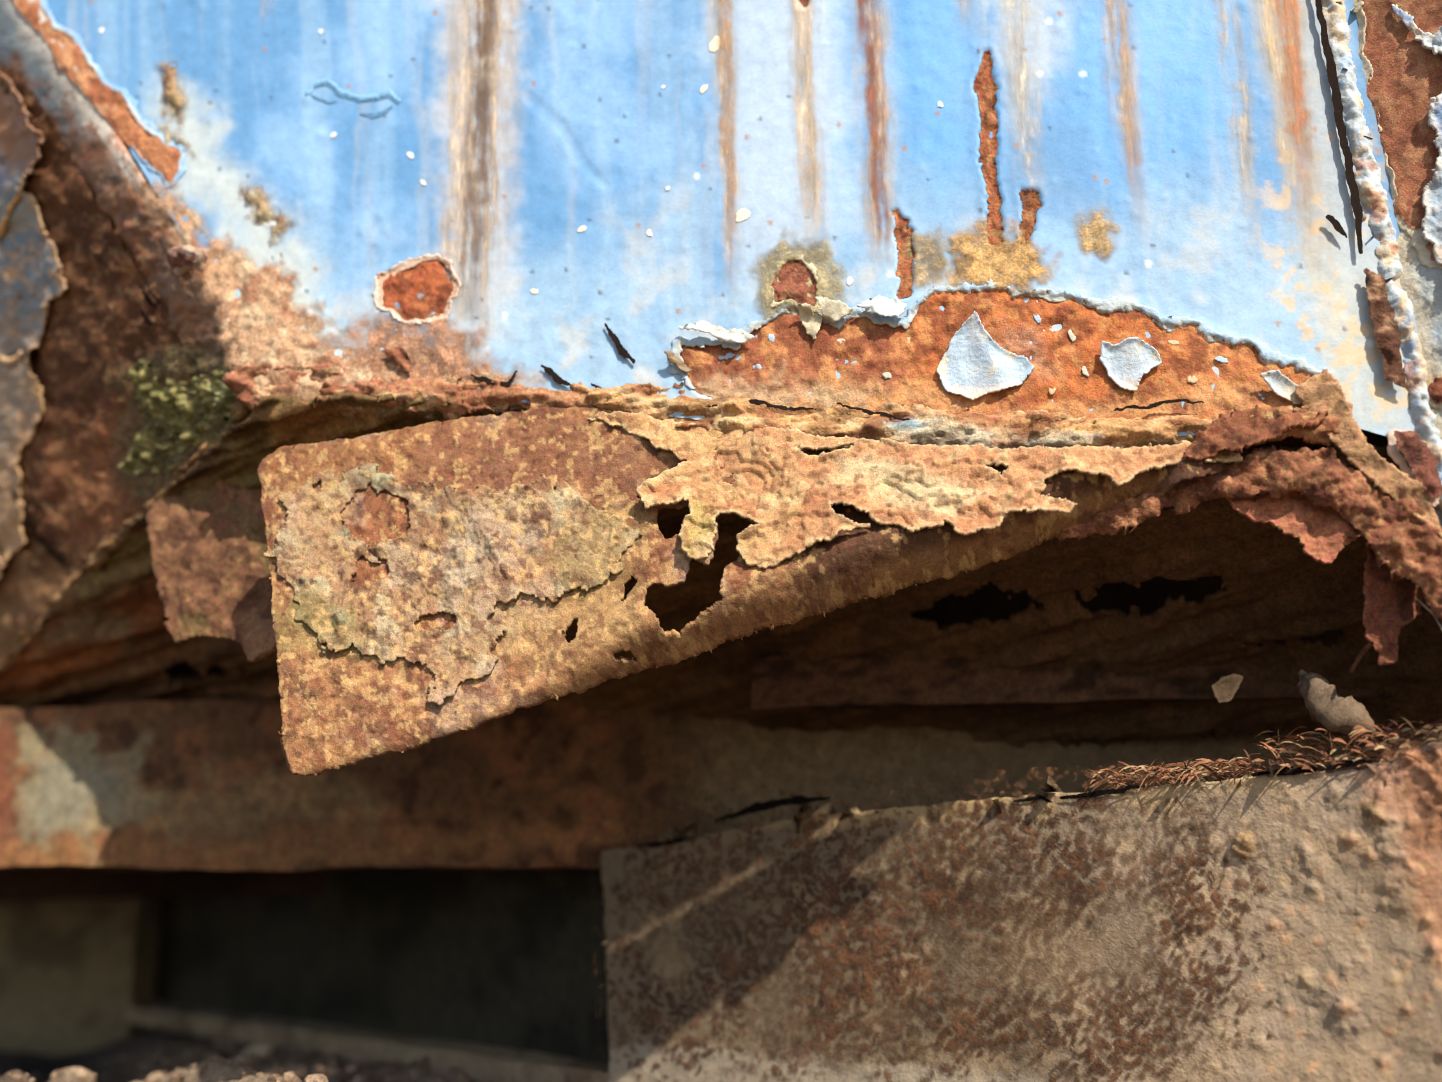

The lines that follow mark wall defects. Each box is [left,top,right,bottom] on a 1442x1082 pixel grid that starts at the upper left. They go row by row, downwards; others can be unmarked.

peeling [0,71,67,579]
corrosion [148,0,521,408]
corrosion [793,0,819,210]
corrosion [859,0,888,239]
corrosion [587,220,1332,569]
corrosion [1006,0,1033,164]
corrosion [1078,212,1118,258]
crack [1315,0,1363,254]
corrosion [1363,268,1408,388]
corrosion [1353,0,1442,269]
corrosion [1384,743,1442,844]